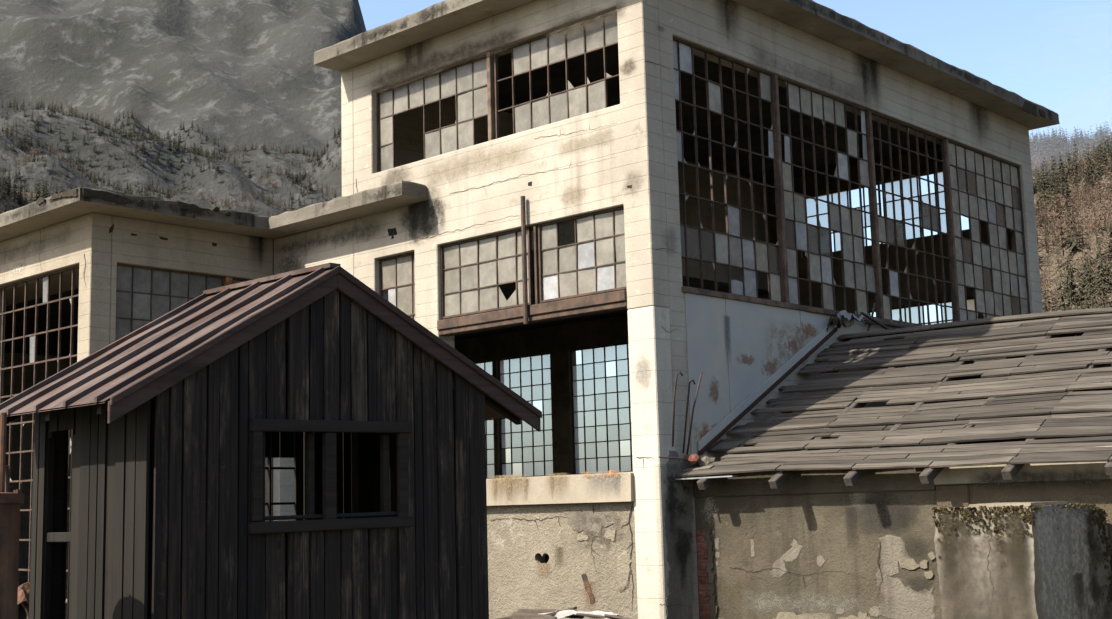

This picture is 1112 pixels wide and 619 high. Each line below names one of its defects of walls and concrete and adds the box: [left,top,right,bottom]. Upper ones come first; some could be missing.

leakage [402,200,443,242]
crack [491,507,594,531]
flaking render [696,528,723,619]
peeling [770,535,937,619]
leakage [1037,512,1112,619]